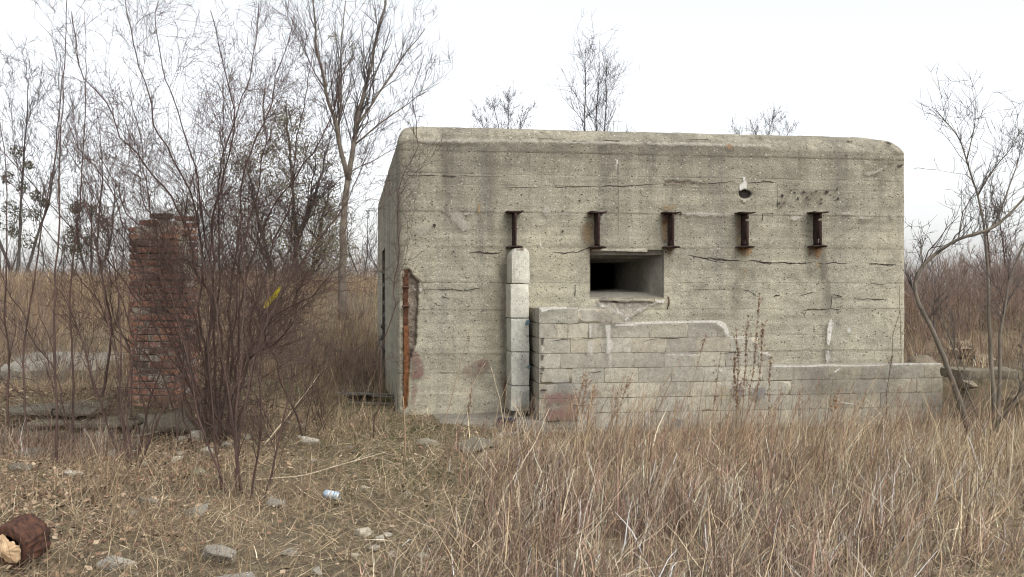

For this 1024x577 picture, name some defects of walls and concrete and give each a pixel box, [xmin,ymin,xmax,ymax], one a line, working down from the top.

crack [690,255,844,264]
spalling [402,270,424,405]